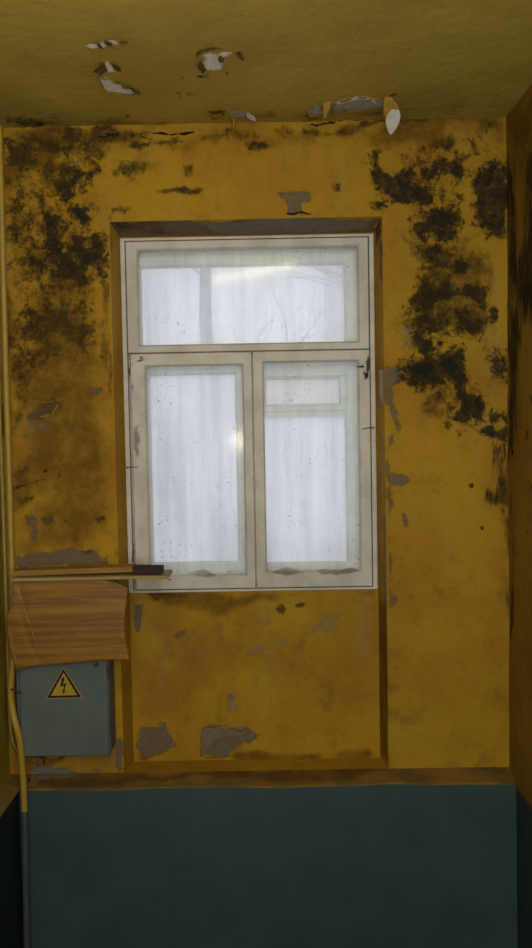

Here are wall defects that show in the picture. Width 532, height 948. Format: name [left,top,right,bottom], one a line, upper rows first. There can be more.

peeling [85,40,128,49]
peeling [94,60,140,95]
peeling [196,47,244,78]
peeling [305,94,401,135]
leakage [248,141,268,150]
leakage [3,122,177,380]
spalling [111,191,382,282]
leakage [368,135,532,553]
spalling [136,722,176,759]
spalling [200,725,257,759]